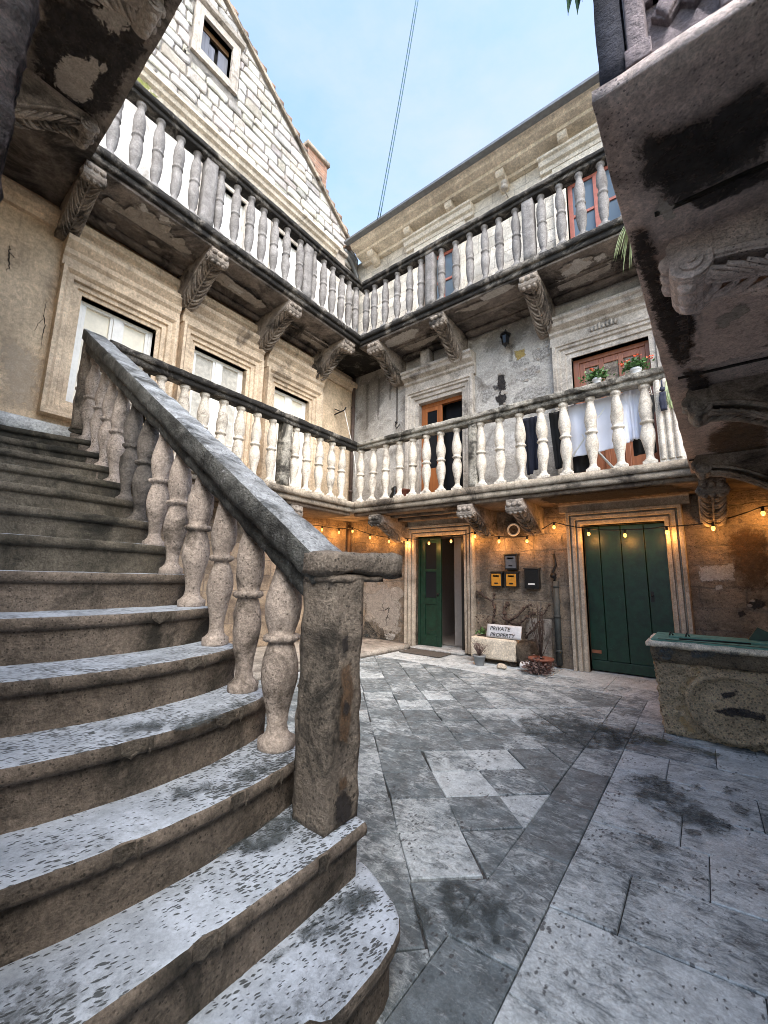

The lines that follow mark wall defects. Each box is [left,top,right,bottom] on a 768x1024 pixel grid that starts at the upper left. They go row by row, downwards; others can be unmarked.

spalling [54,54,108,103]
leakage [632,82,768,220]
spalling [102,197,192,255]
leakage [629,229,712,391]